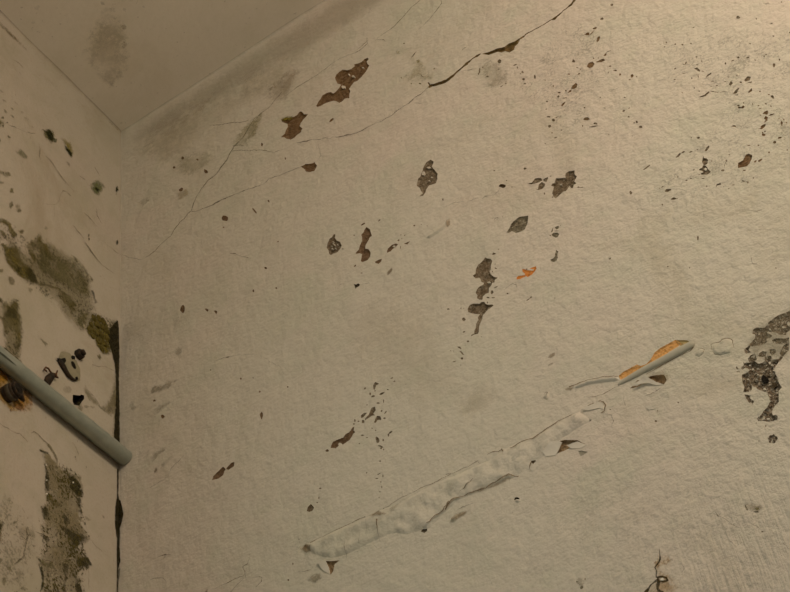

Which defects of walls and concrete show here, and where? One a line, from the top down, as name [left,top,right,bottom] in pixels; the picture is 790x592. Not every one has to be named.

leakage [44,130,73,156]
crack [74,114,294,272]
spalling [316,58,369,107]
crack [297,0,576,145]
spalling [529,171,583,198]
leakage [0,299,22,359]
leakage [0,219,111,327]
crack [108,320,120,442]
spalling [450,249,516,362]
spalling [736,311,790,443]
leakage [33,431,91,592]
crack [115,469,123,592]